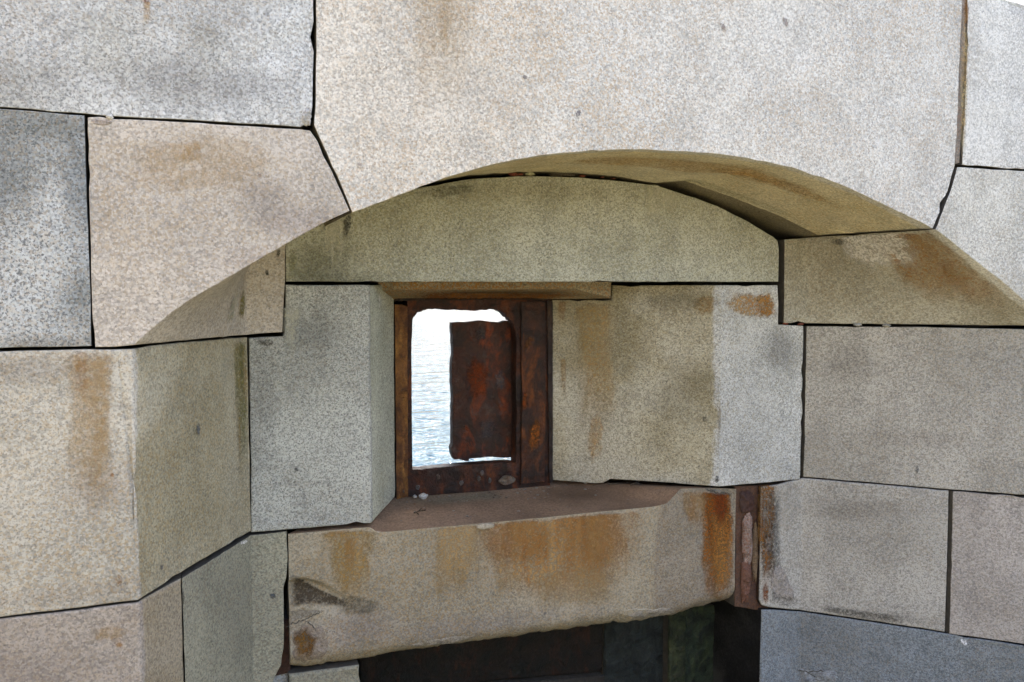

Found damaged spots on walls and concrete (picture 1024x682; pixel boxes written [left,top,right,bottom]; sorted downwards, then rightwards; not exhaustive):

corrosion [729,294,774,316]
corrosion [684,492,733,598]
corrosion [758,485,775,600]
corrosion [294,630,316,656]